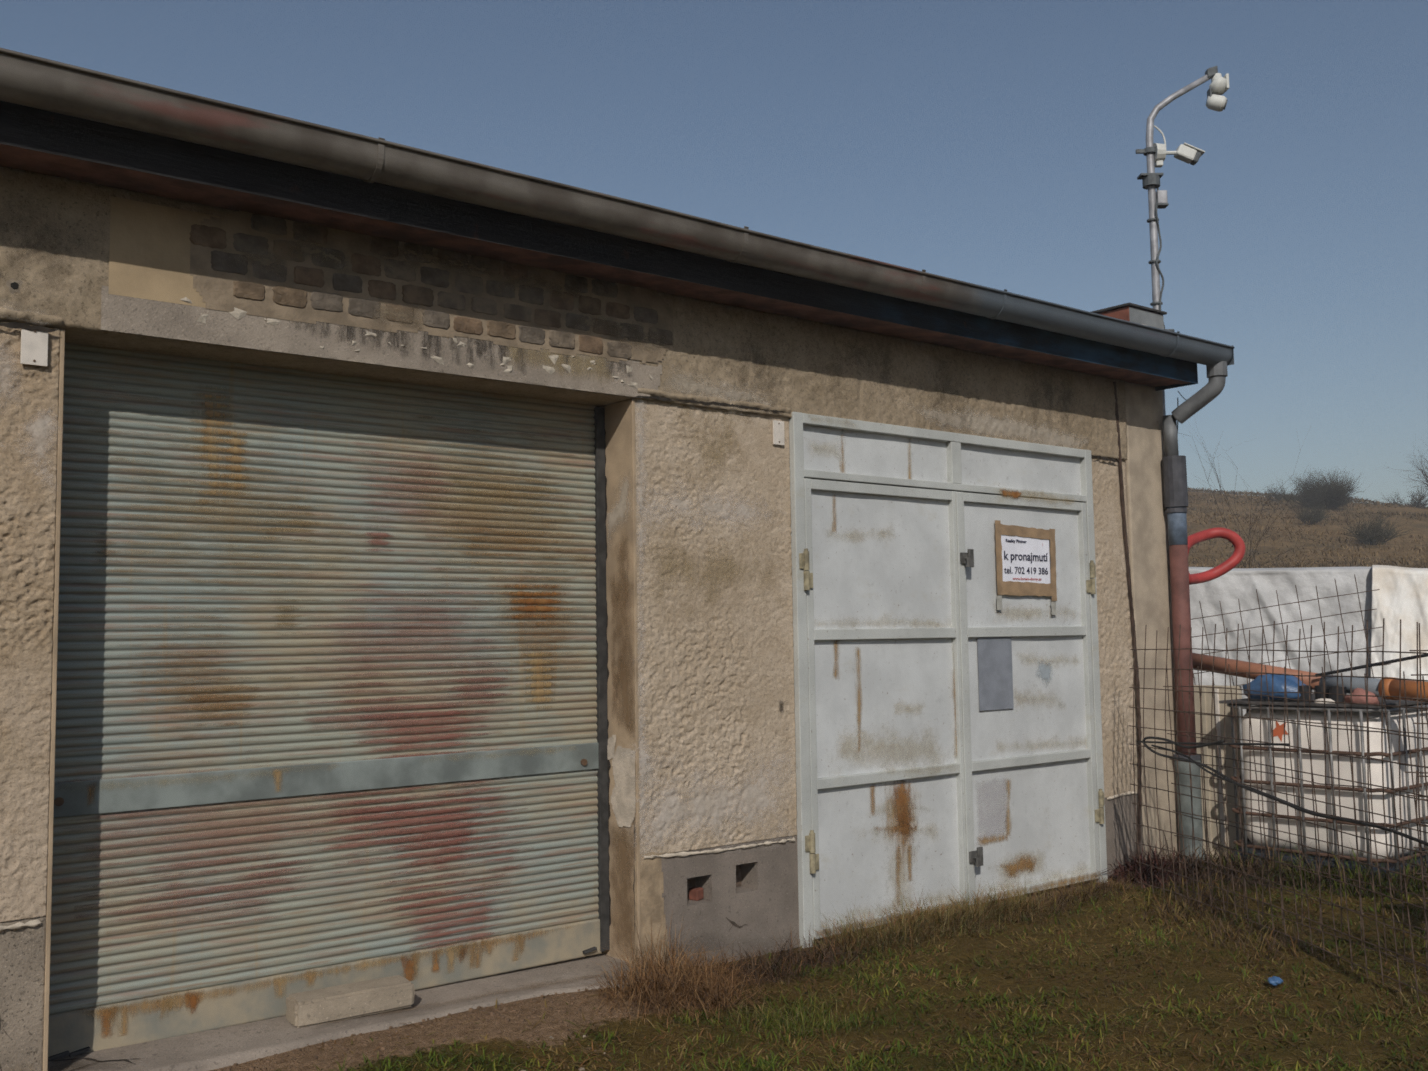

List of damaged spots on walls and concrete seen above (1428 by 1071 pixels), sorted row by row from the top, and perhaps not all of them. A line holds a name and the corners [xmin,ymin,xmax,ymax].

crack [0,307,63,332]
spalling [180,211,674,388]
rust [132,394,325,574]
rust [503,585,561,703]
rust [870,782,956,925]
rust [986,857,1035,899]
rust [97,989,231,1036]
rust [259,932,541,995]